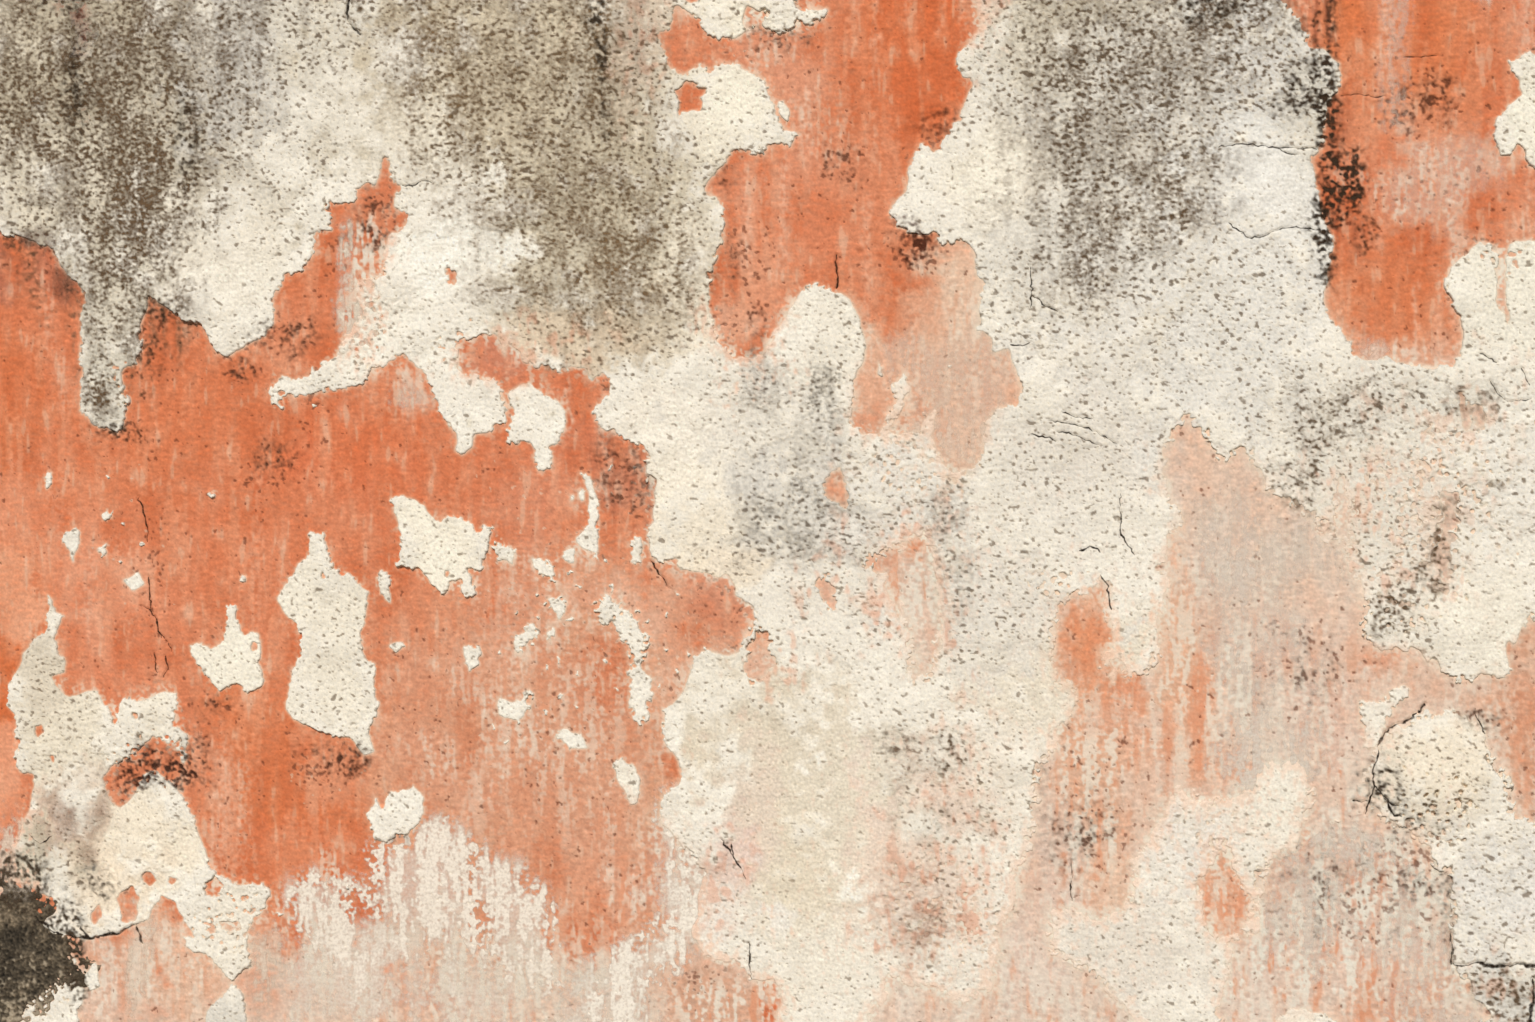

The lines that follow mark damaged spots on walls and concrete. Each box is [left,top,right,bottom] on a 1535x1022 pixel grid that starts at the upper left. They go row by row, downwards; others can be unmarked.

water stain [0,0,264,352]
crack [346,0,361,35]
flaking render [0,0,828,455]
water stain [402,0,684,345]
water stain [1035,0,1279,295]
water stain [1273,0,1372,281]
flaking render [0,595,276,1022]
flaking render [277,495,517,755]
peeling [284,786,565,1022]
flaking render [564,0,1535,1022]
crack [1352,703,1425,817]
crack [1450,934,1535,1022]